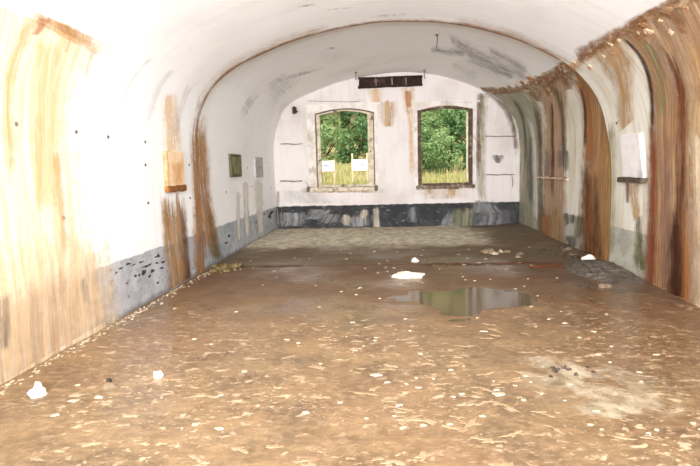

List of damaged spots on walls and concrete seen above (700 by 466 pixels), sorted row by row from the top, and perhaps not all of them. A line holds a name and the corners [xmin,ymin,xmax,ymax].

corrosion [0,7,114,383]
corrosion [164,95,221,288]
damp [497,99,538,221]
corrosion [481,0,696,305]